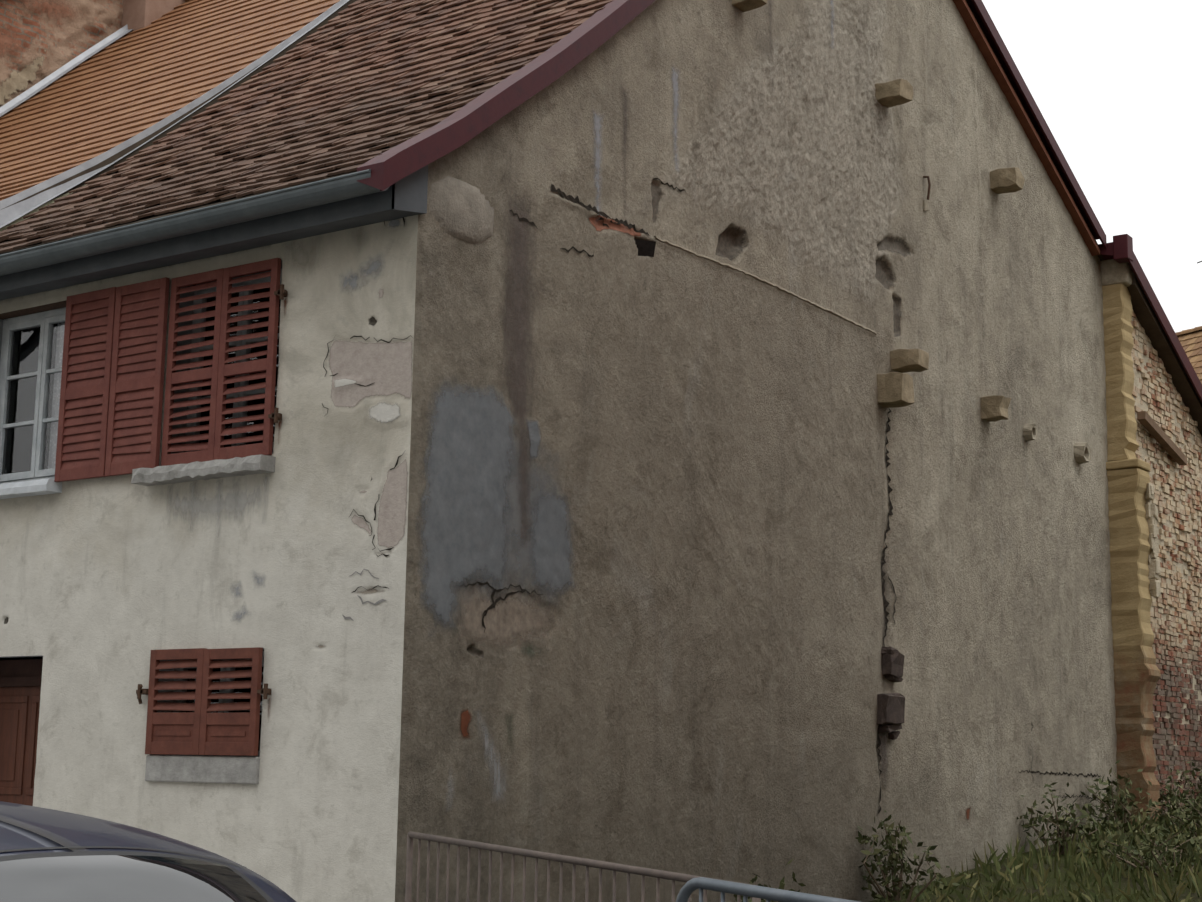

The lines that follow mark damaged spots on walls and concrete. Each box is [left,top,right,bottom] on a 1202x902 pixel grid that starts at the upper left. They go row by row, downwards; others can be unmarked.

crack [510,209,538,229]
crack [551,184,650,257]
spalling [716,227,746,260]
flaking render [322,335,414,422]
flaking render [348,451,407,557]
crack [881,409,896,647]
crack [875,732,883,823]